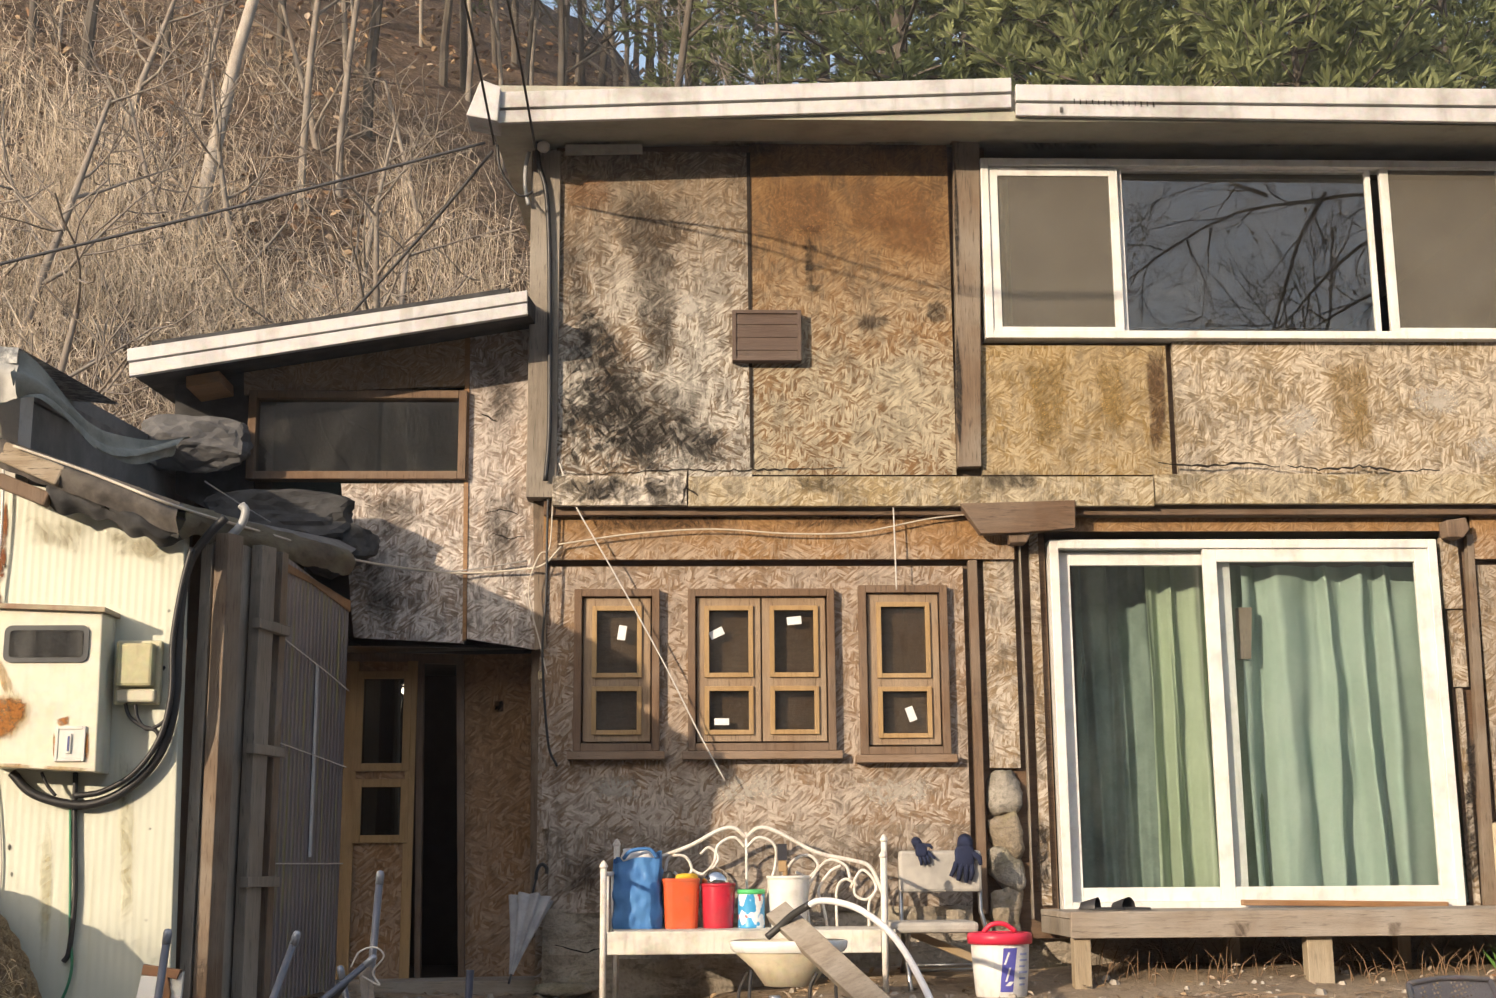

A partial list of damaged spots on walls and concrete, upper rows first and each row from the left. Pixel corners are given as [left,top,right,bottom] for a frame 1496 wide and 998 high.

water stain [621,205,676,363]
water stain [562,313,722,530]
corrosion [0,503,8,603]
water stain [798,516,925,527]
corrosion [0,664,25,737]